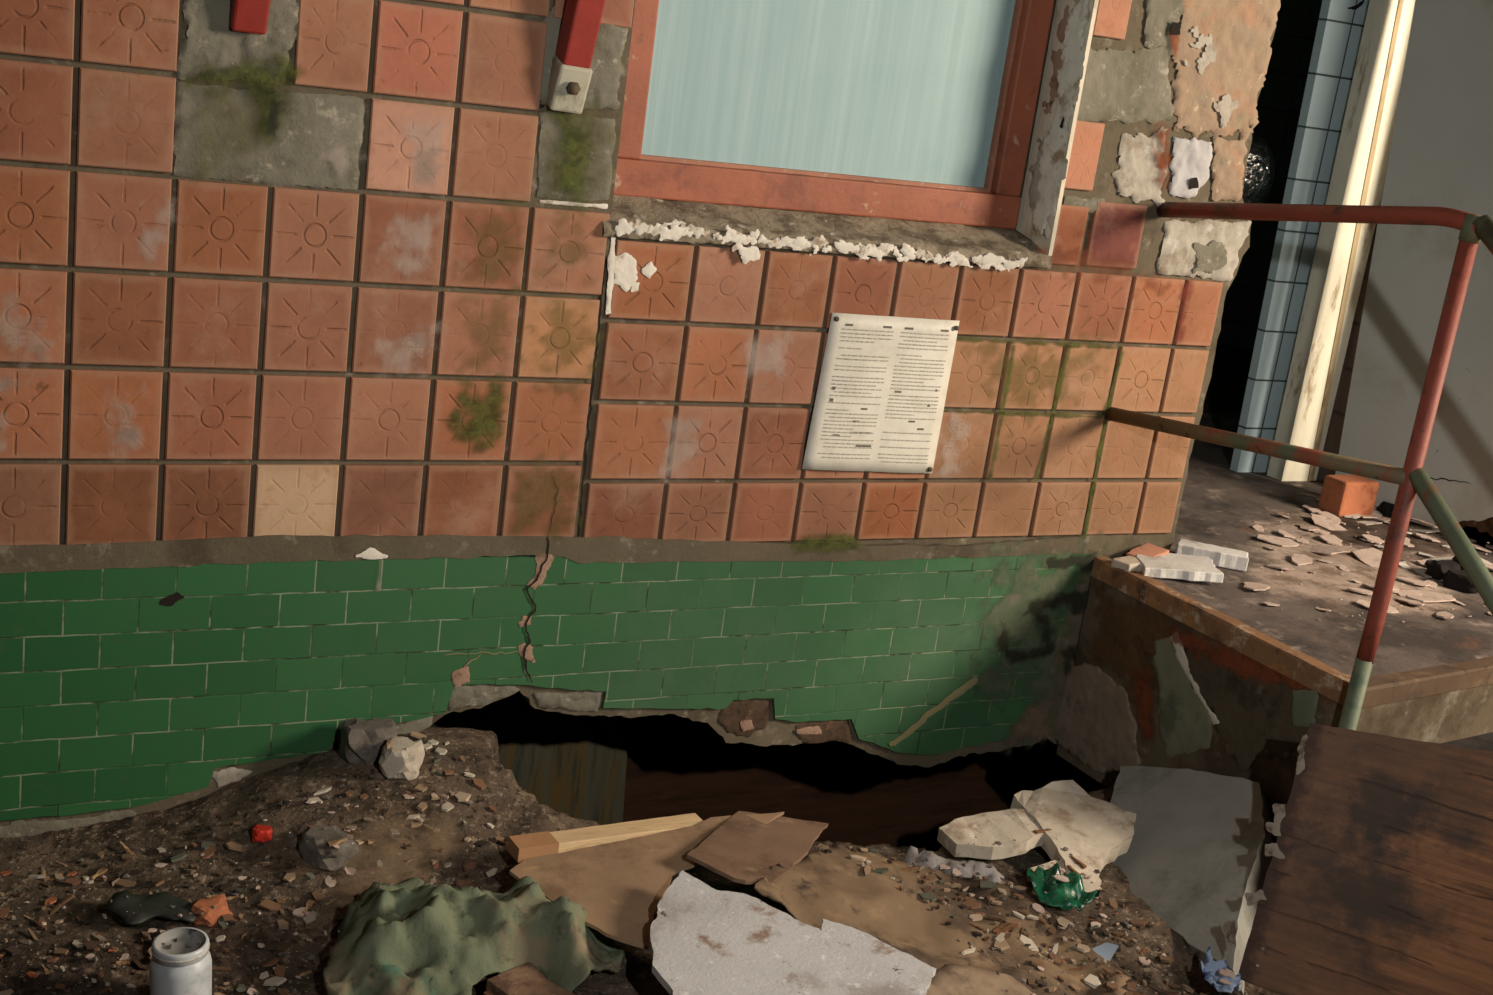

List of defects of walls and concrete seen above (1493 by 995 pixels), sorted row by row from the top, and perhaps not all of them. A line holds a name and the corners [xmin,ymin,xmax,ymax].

spalling [531,6,1028,314]
spalling [1029,0,1281,282]
crack [447,243,607,687]
crack [889,677,978,747]
leakage [999,591,1090,675]
leakage [1047,555,1096,572]